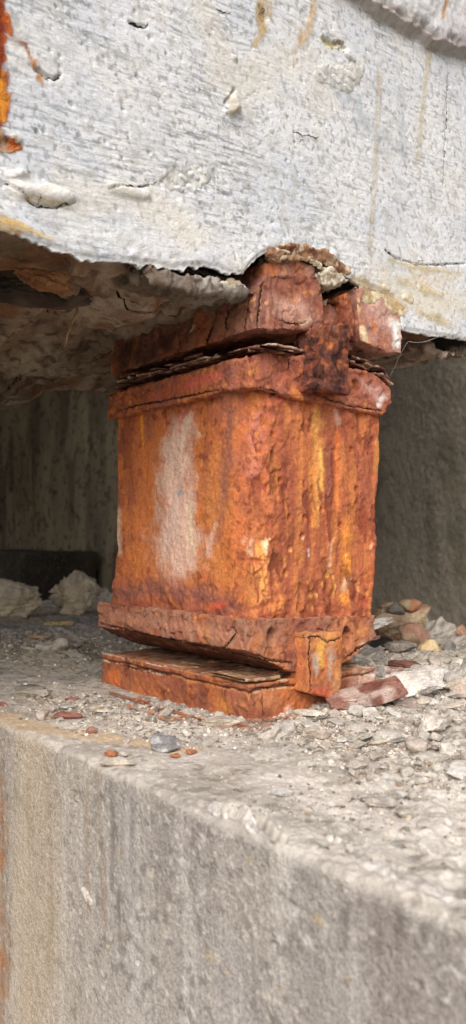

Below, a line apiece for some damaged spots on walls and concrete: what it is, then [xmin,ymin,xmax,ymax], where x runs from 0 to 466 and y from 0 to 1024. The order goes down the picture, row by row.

rust [0,0,43,152]
spalling [118,264,250,306]
rust [114,343,304,390]
rust [348,355,393,386]
rust [109,648,292,682]
rust [110,692,205,721]